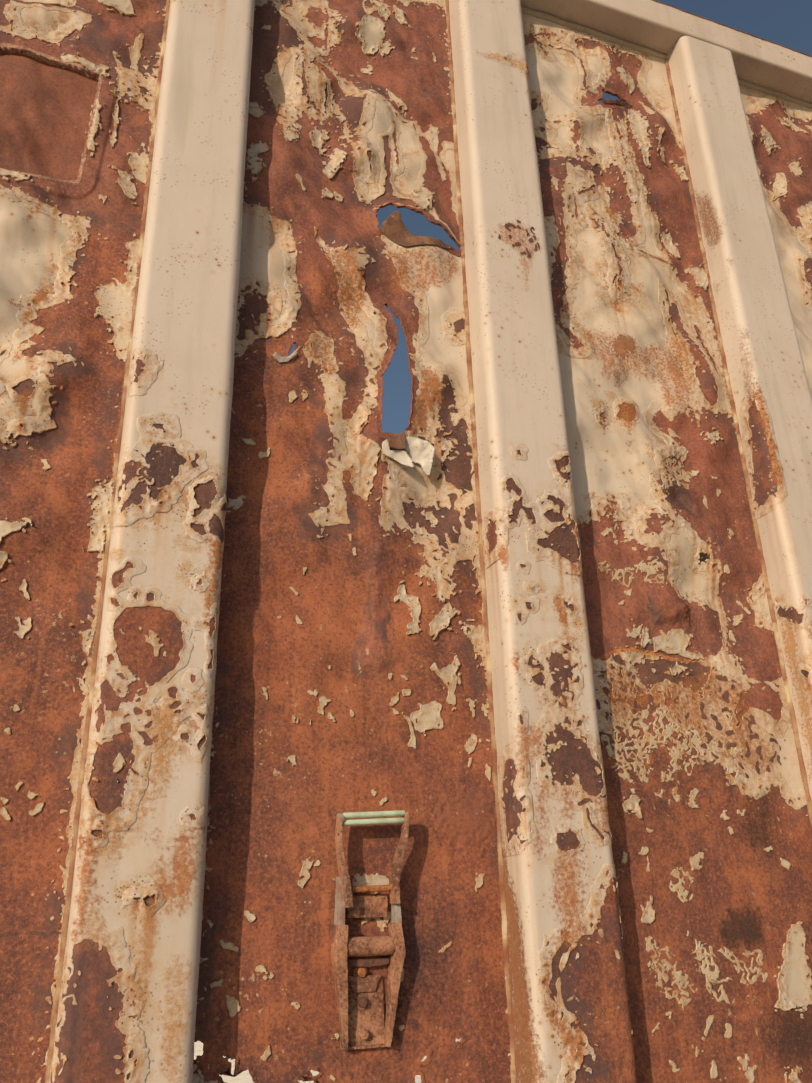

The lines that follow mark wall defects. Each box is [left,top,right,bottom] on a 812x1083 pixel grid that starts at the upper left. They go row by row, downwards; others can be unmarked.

corrosion [367,121,460,241]
corrosion [698,196,719,242]
corrosion [588,333,698,410]
peeling [0,0,541,1083]
spalling [482,23,812,1083]
corrosion [113,606,183,684]
corrosion [782,623,812,769]
corrosion [72,821,119,940]
corrosion [156,834,197,909]
corrosion [500,830,544,1083]
corrosion [553,855,583,947]
corrosion [545,964,583,1069]